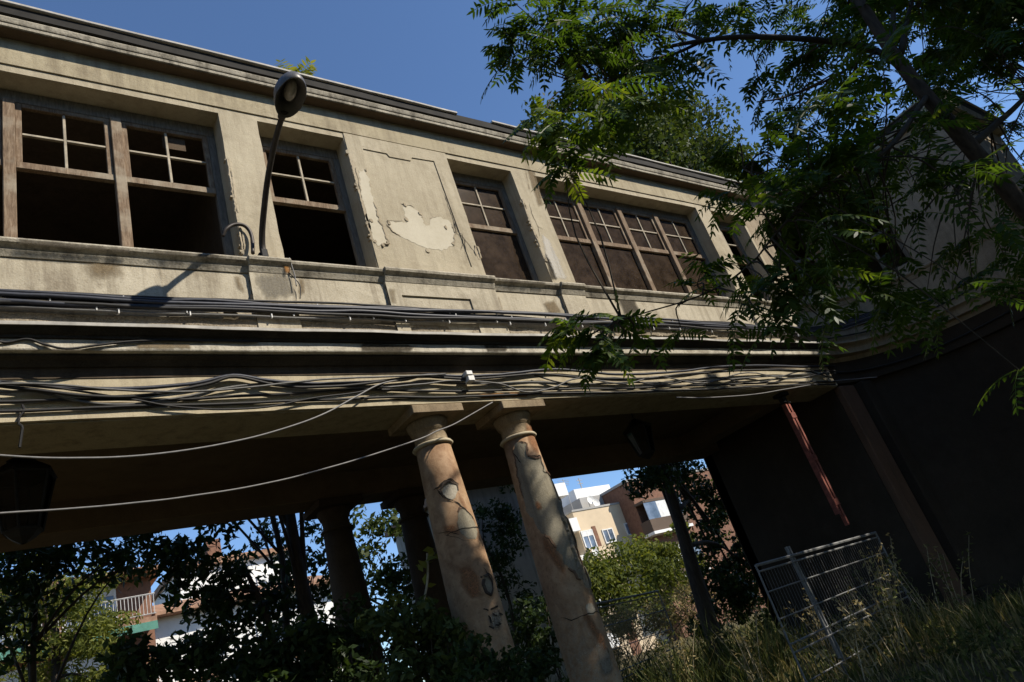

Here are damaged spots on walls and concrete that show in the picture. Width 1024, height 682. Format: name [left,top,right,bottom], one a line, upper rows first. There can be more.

flaking render [344,149,456,253]
peeling [434,478,478,539]
peeling [512,441,597,615]